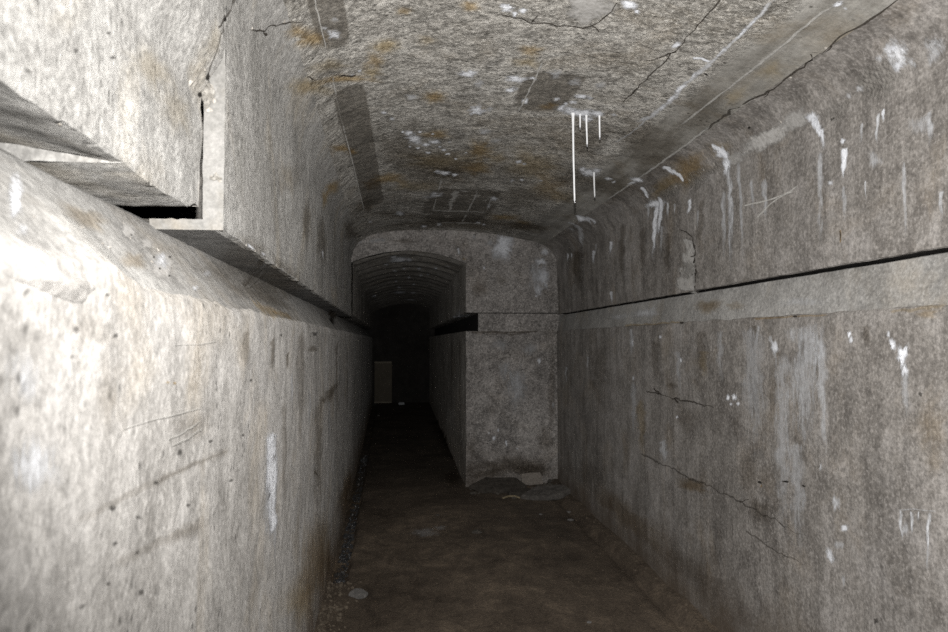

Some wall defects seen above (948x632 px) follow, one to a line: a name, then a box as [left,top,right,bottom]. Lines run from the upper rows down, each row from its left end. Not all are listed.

crack [209,0,235,70]
crack [498,3,617,32]
crack [623,0,769,121]
crack [696,0,897,138]
damp [807,113,824,141]
damp [579,167,615,183]
damp [629,178,676,248]
damp [712,144,743,248]
crack [681,230,699,293]
damp [888,332,907,375]
crack [646,388,714,408]